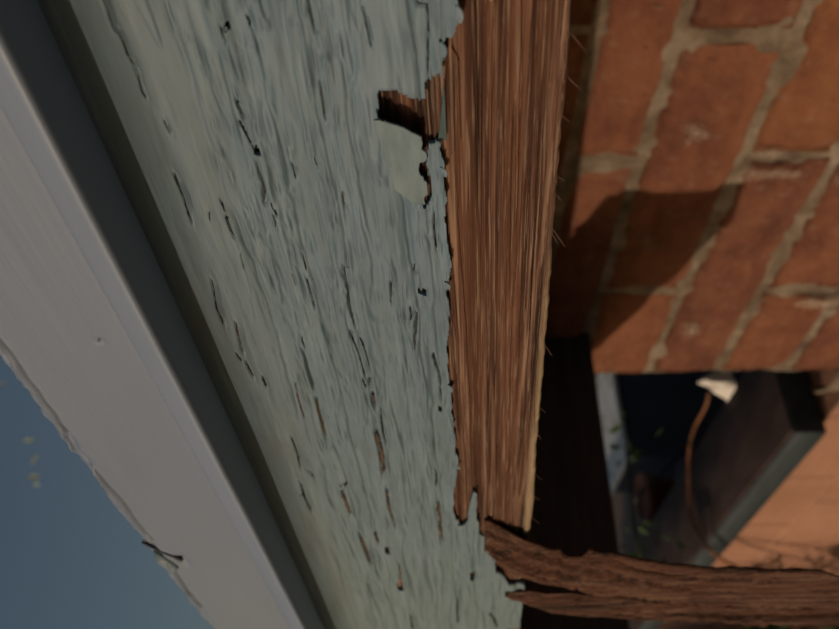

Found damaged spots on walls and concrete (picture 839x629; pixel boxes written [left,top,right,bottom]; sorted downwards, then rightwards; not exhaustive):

crack [104,0,147,97]
crack [364,8,374,47]
crack [416,0,429,96]
crack [236,102,277,227]
crack [174,175,246,270]
peeling [374,0,584,540]
crack [212,279,267,386]
crack [295,338,334,437]
crack [343,268,403,565]
crack [389,284,447,400]
crack [435,469,443,541]
crack [141,541,184,572]